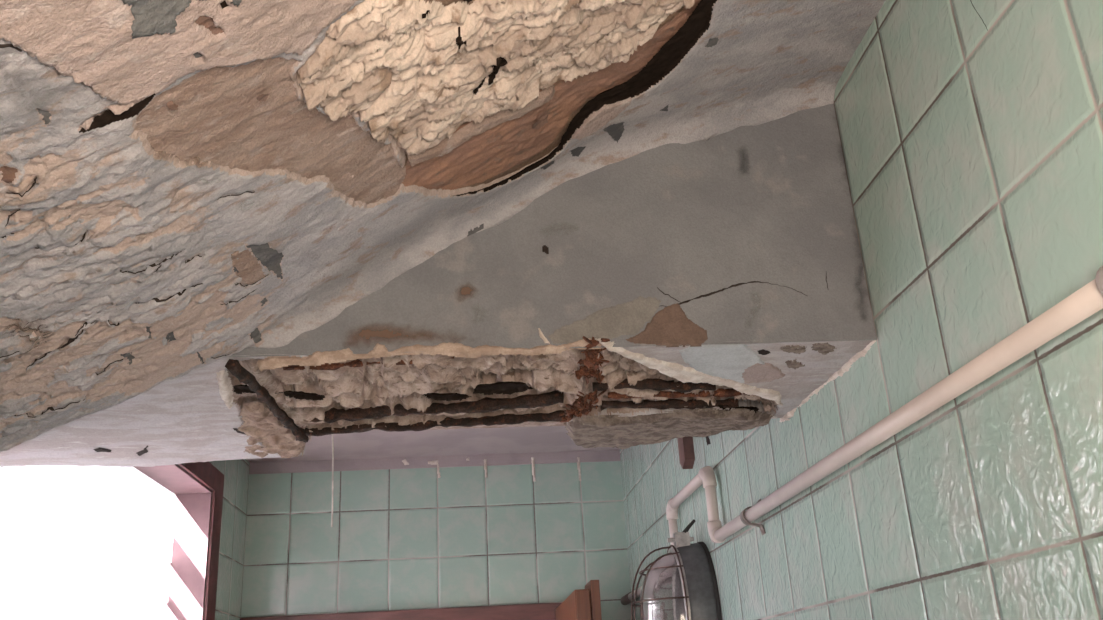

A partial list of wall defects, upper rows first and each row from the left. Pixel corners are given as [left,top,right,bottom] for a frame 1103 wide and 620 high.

crack [0,44,22,52]
flaking render [0,0,718,204]
crack [488,58,510,86]
crack [0,177,90,255]
crack [0,249,269,372]
crack [657,274,828,307]
crack [13,359,124,420]
spalling [216,296,837,458]